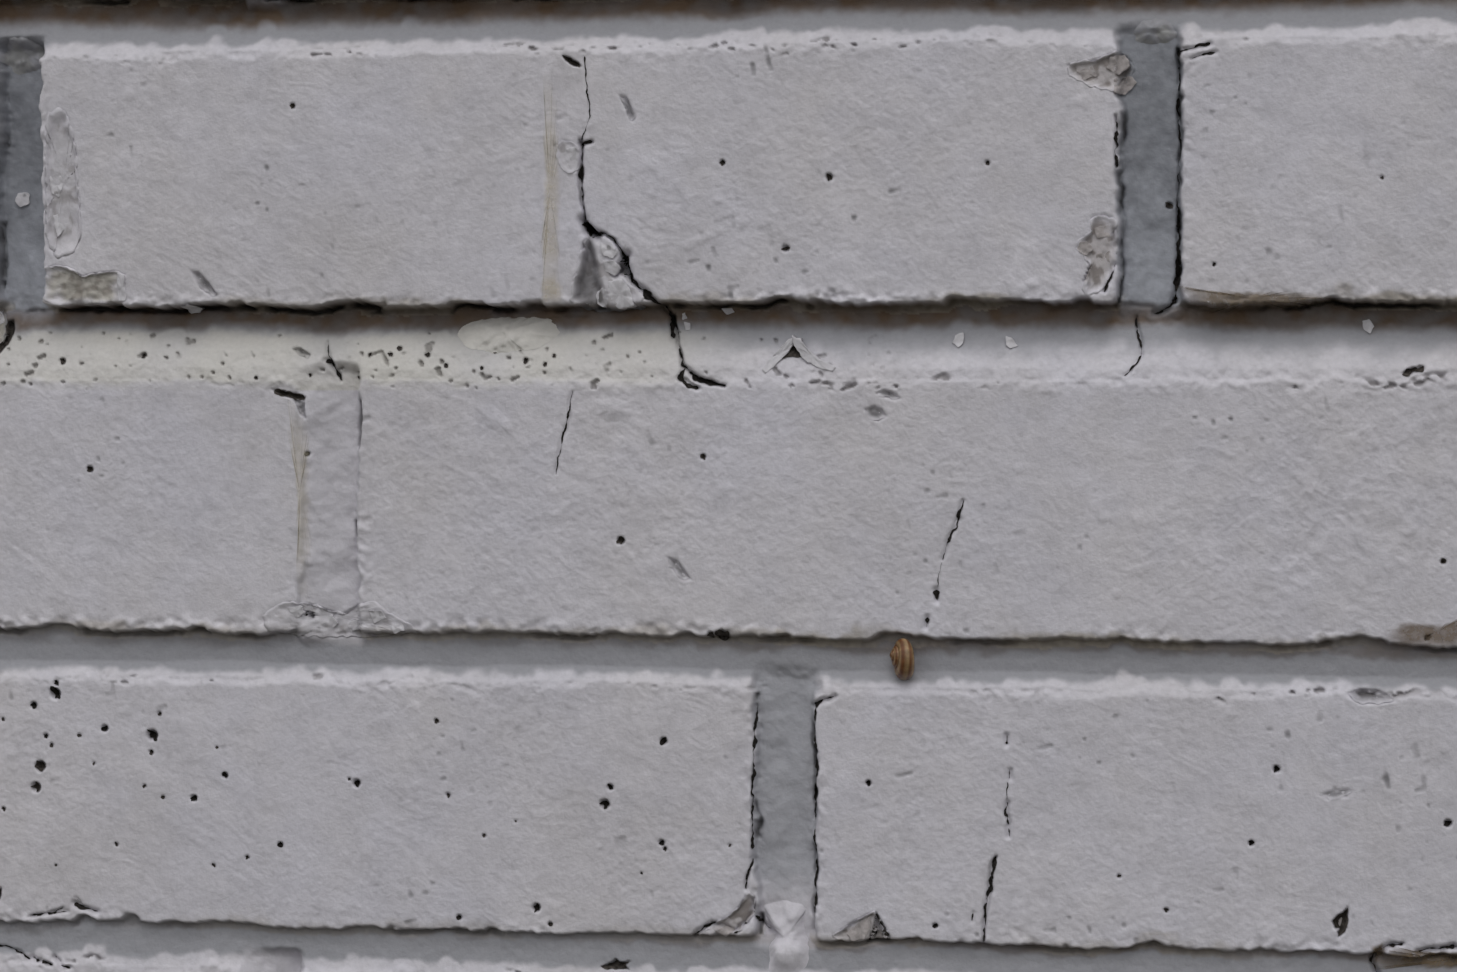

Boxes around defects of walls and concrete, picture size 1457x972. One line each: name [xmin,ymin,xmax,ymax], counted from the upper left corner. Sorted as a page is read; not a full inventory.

spalling [43,107,127,306]
spalling [569,222,646,312]
crack [578,56,726,389]
spalling [1076,215,1119,296]
spalling [1067,51,1137,95]
crack [1112,122,1120,167]
crack [1124,42,1215,376]
crack [925,500,964,627]
crack [813,696,834,911]
crack [972,741,1010,941]